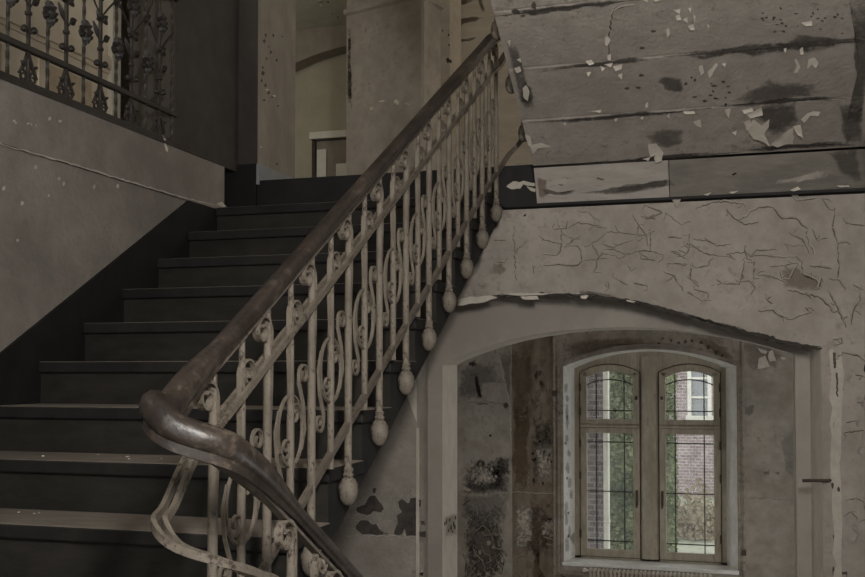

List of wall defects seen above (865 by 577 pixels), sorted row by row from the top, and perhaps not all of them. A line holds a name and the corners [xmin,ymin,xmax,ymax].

peeling [563,54,639,80]
damp [747,82,809,102]
damp [761,7,865,140]
peeling [732,105,820,147]
crack [0,143,220,207]
peeling [506,178,571,195]
peeling [592,178,667,193]
peeling [644,143,663,163]
crack [494,195,865,441]
damp [462,411,553,492]
peeling [458,292,847,577]
peeling [356,488,426,537]